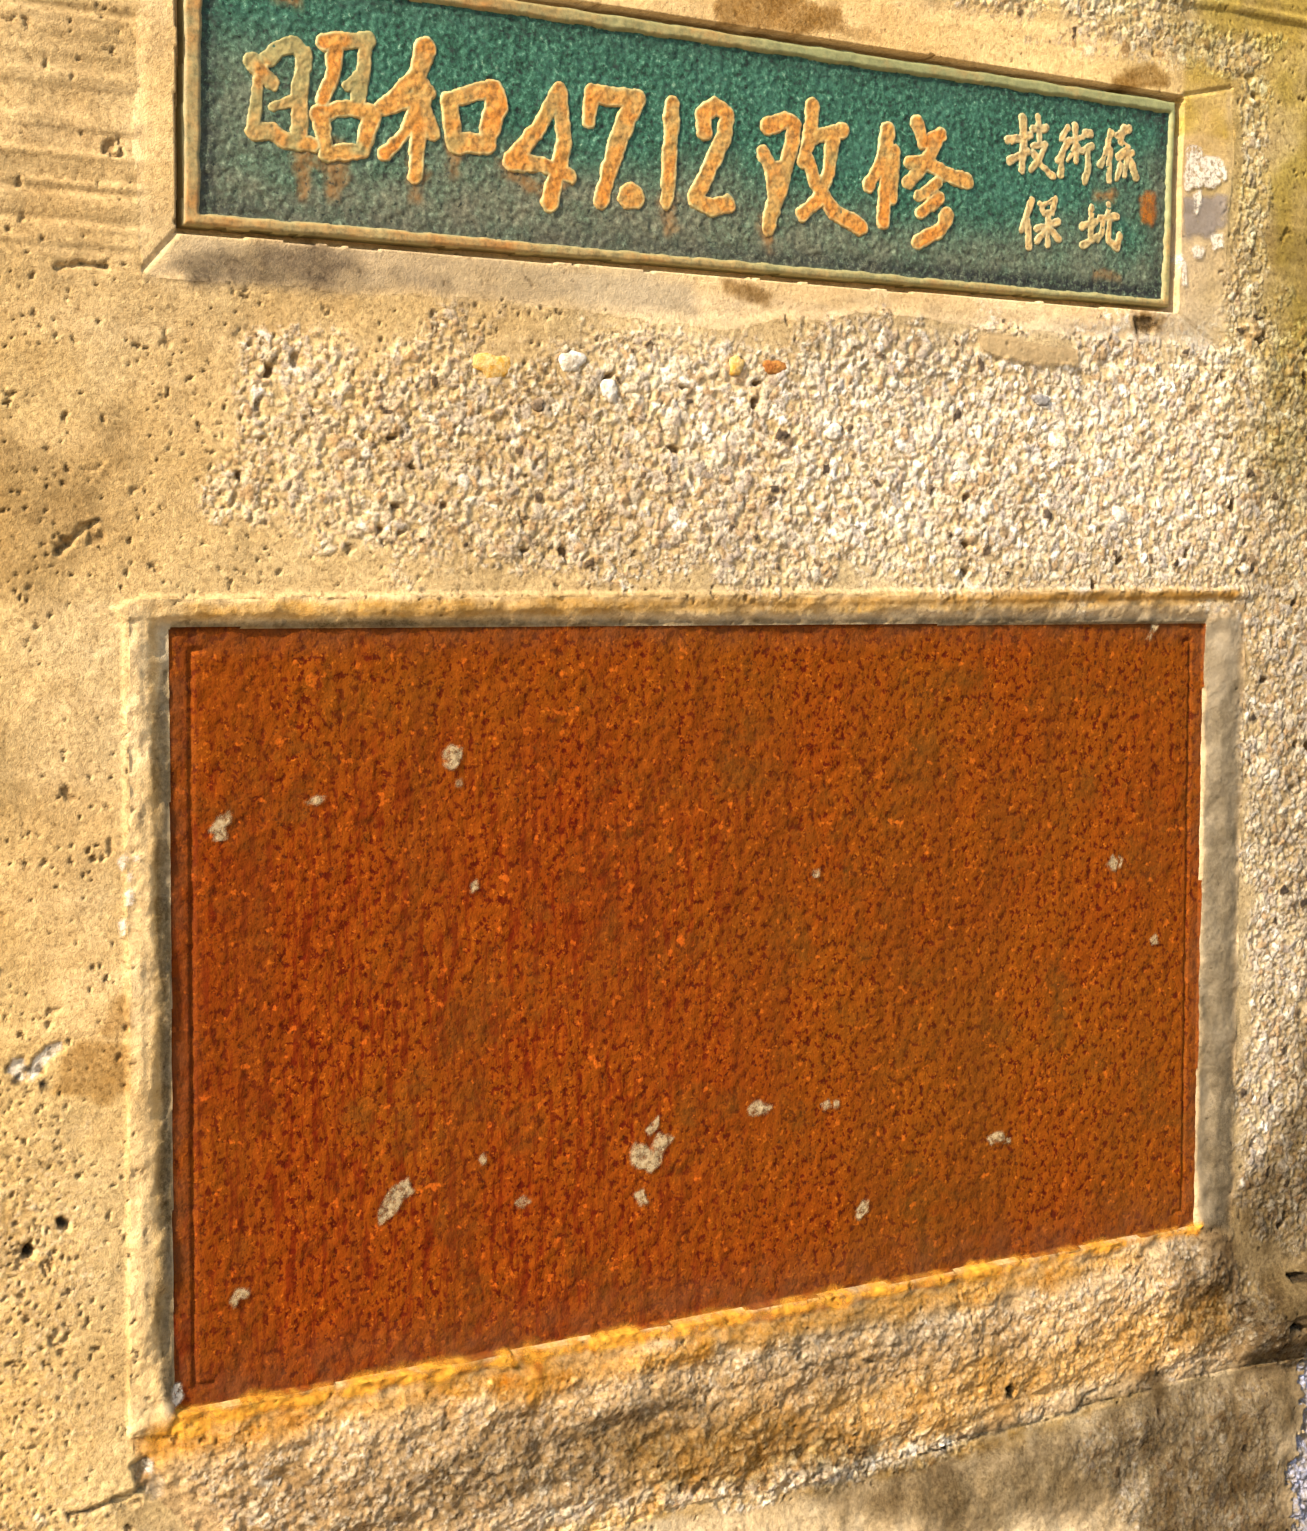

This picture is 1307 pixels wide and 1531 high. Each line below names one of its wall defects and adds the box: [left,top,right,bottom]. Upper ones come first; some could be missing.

rust [1153,1224,1203,1239]
rust [150,1239,1127,1441]